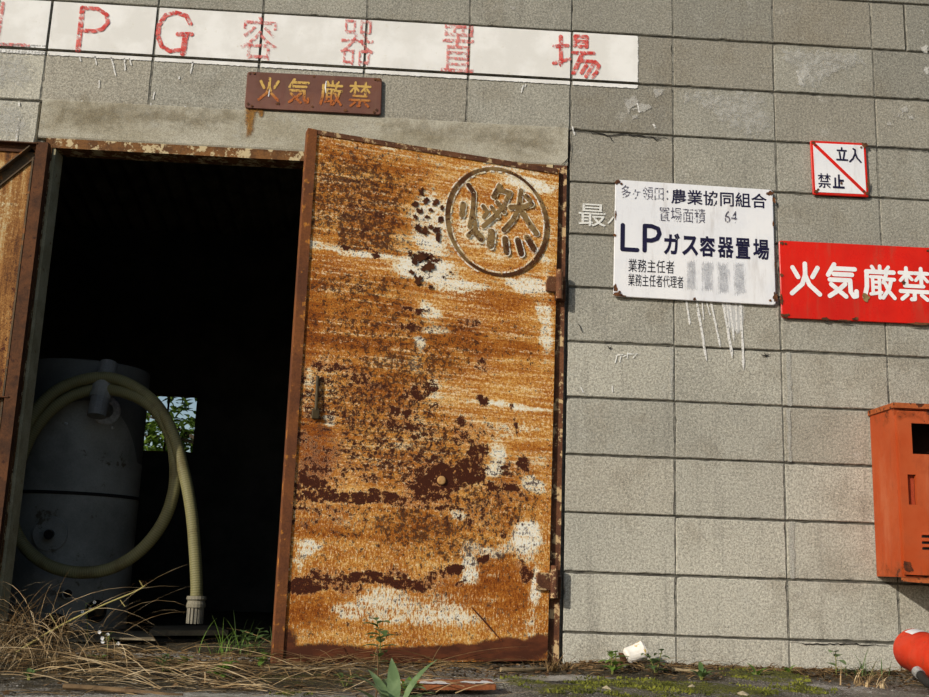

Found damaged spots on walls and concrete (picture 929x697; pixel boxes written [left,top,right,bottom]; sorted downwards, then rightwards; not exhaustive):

corrosion [245,108,264,136]
leakage [686,301,745,370]